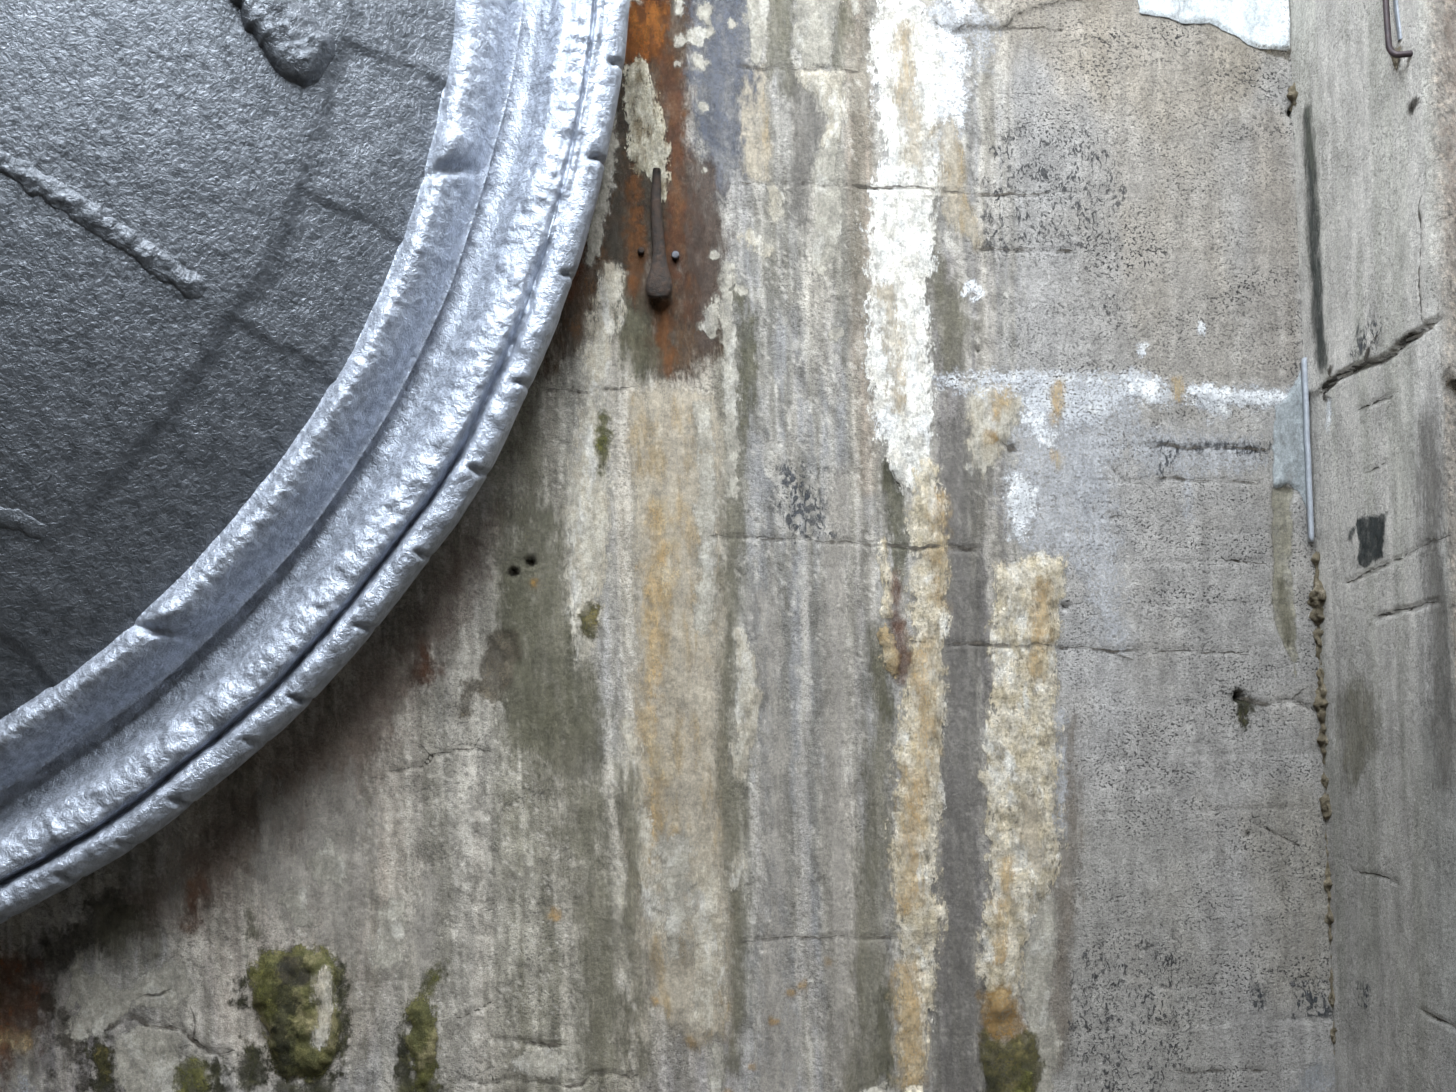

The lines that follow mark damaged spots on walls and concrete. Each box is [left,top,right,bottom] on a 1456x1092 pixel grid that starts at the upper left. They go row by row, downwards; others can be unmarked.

peeling [1138,0,1291,60]
corrosion [538,0,724,382]
leakage [496,0,1289,1092]
crack [1236,687,1314,725]
corrosion [0,955,56,1072]
leakage [37,889,193,1092]